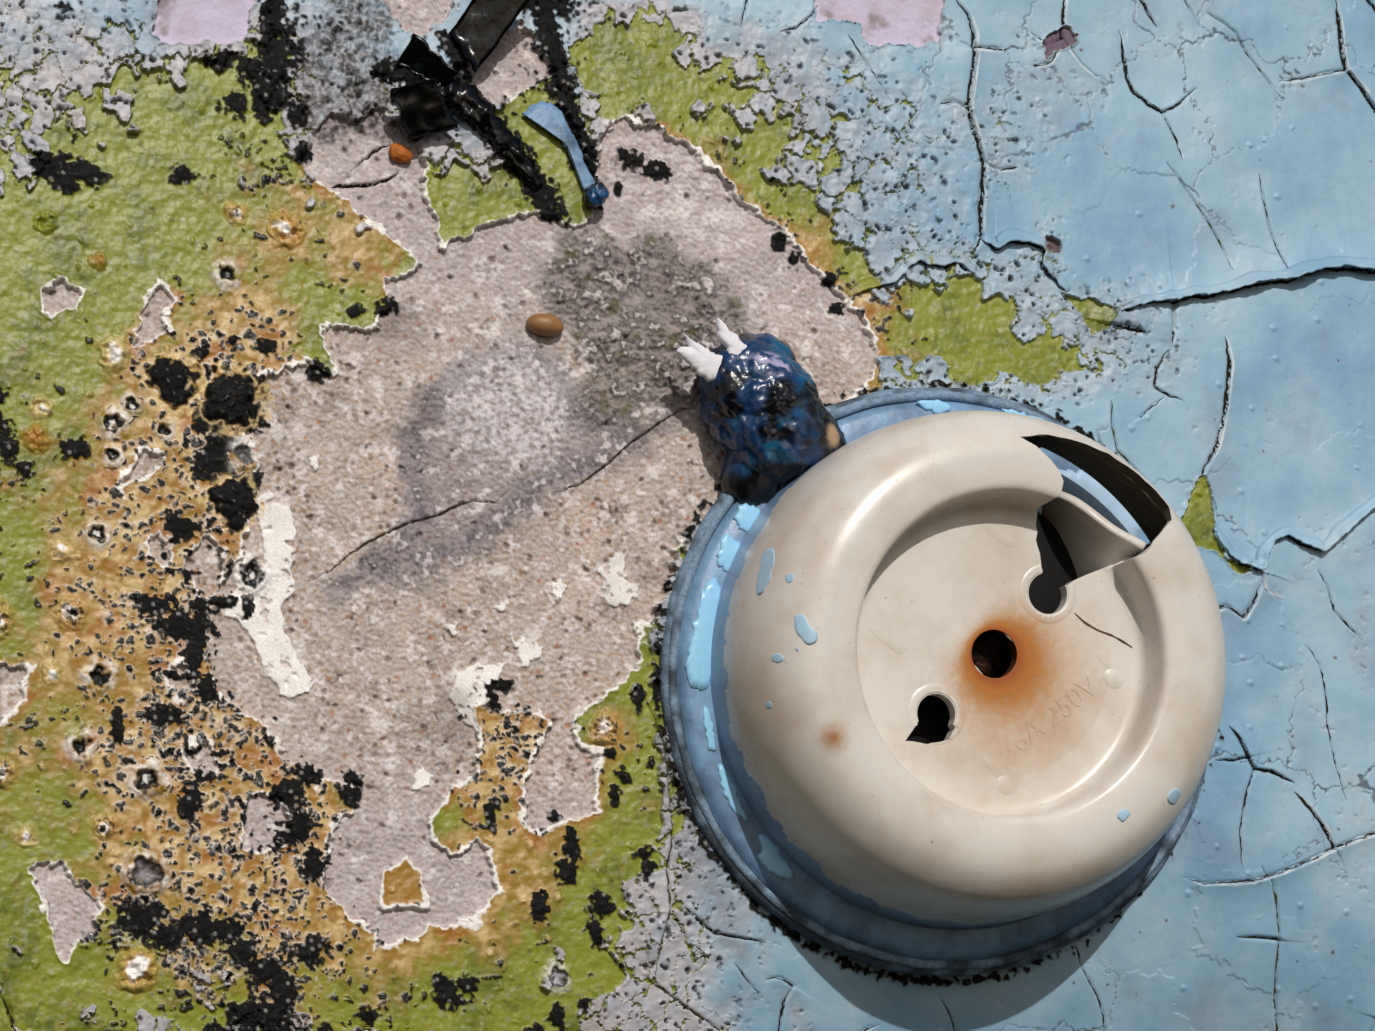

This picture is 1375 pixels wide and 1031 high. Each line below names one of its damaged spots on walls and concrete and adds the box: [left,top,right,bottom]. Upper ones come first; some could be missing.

crack [846,0,1375,478]
peeling [869,249,1125,393]
leakage [0,388,36,481]
leakage [90,323,333,883]
flaking render [0,0,883,1031]
peeling [1058,469,1141,538]
peeling [1181,476,1252,574]
crack [1213,494,1375,640]
leakage [337,769,365,810]
crack [645,696,793,1031]
crack [1182,727,1375,1031]
leakage [83,888,335,1031]